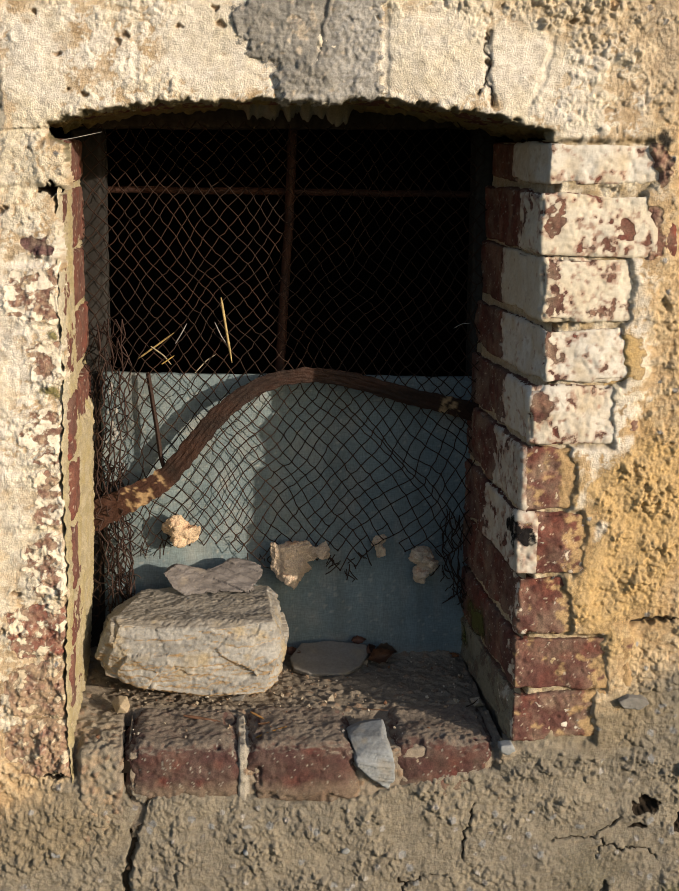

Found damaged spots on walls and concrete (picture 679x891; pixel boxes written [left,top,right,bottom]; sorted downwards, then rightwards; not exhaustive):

crack [479,33,494,105]
spalling [2,235,61,325]
spalling [23,339,67,385]
peeling [480,141,675,739]
crack [630,614,679,622]
crack [122,726,154,891]
crack [551,816,655,857]